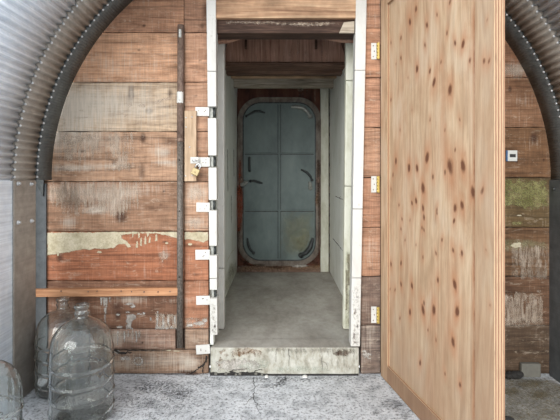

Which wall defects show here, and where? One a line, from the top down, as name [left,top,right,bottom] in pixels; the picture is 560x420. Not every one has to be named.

peeling [47,232,177,256]
peeling [184,232,208,245]
peeling [511,242,547,277]
peeling [505,291,543,325]
spalling [210,369,358,378]